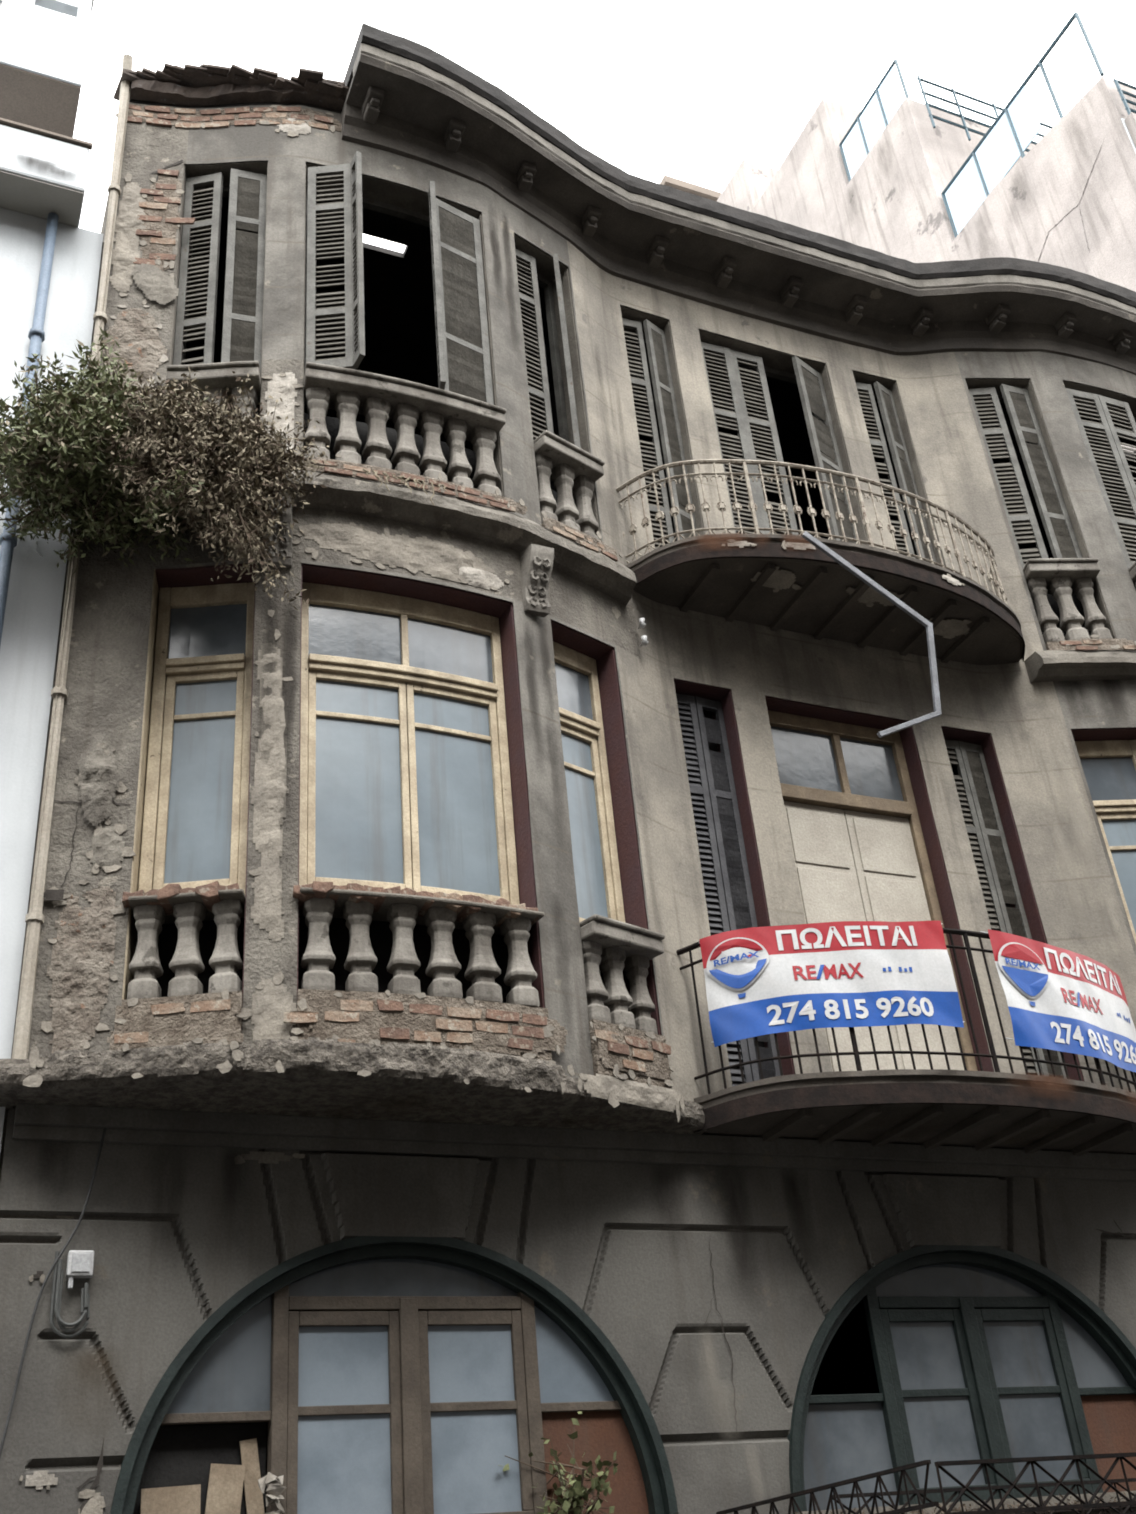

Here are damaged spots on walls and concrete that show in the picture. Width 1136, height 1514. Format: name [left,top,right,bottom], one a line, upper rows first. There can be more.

flaking render [102,169,195,395]
flaking render [261,372,623,562]
flaking render [1059,635,1136,651]
flaking render [23,610,684,1123]
flaking render [78,1489,106,1514]